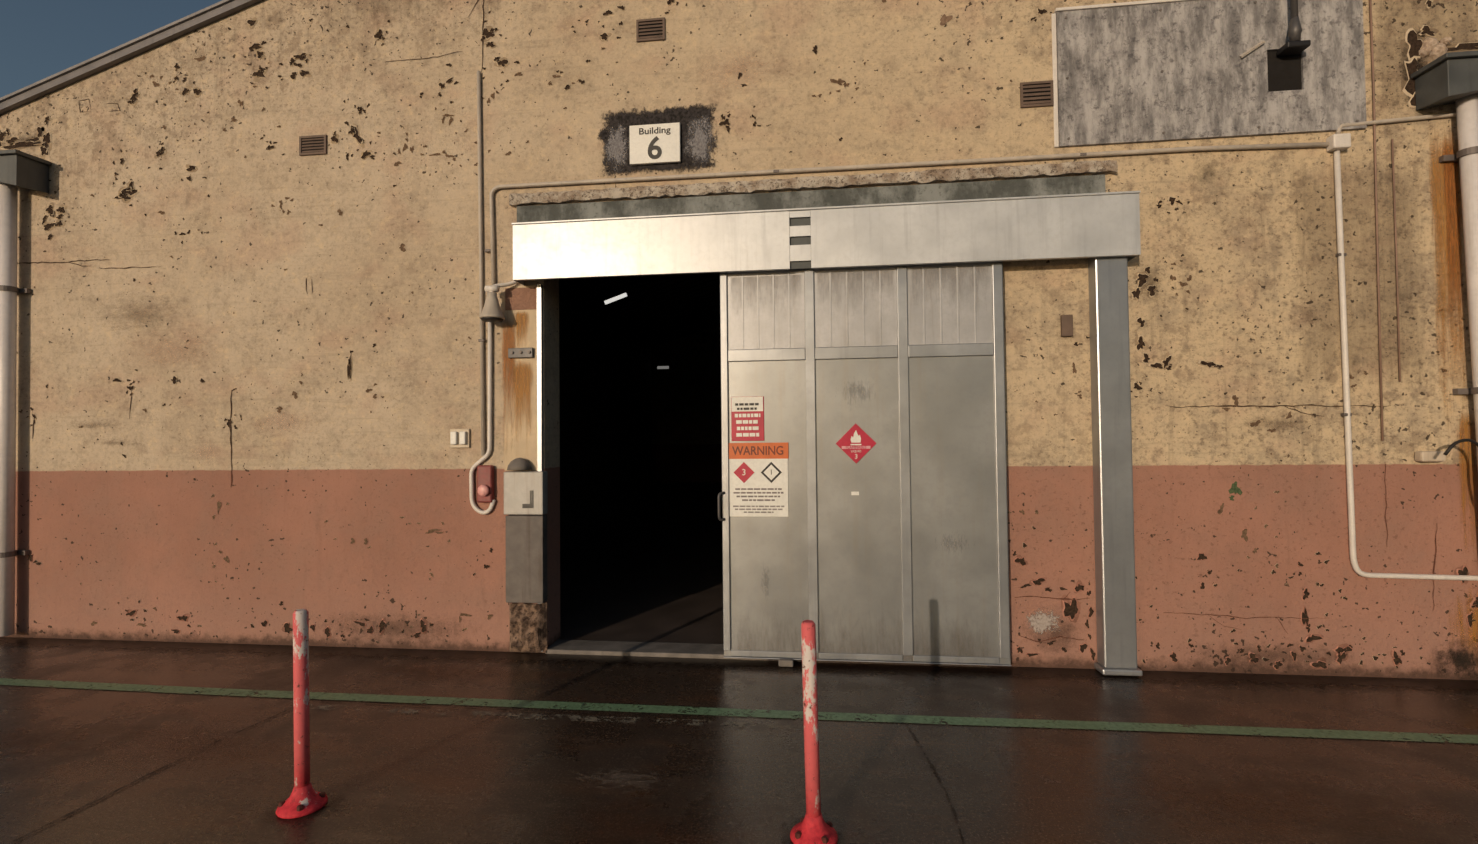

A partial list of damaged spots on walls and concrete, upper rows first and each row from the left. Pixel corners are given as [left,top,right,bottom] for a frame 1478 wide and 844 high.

spalling [0,115,61,181]
peeling [18,202,75,252]
crack [17,259,150,269]
peeling [112,150,168,216]
peeling [122,41,220,170]
peeling [181,164,223,197]
peeling [223,17,324,132]
spalling [1399,0,1478,114]
rust [1432,144,1462,336]
rust [502,313,530,409]
peeling [1008,509,1096,662]
peeling [1212,552,1423,670]